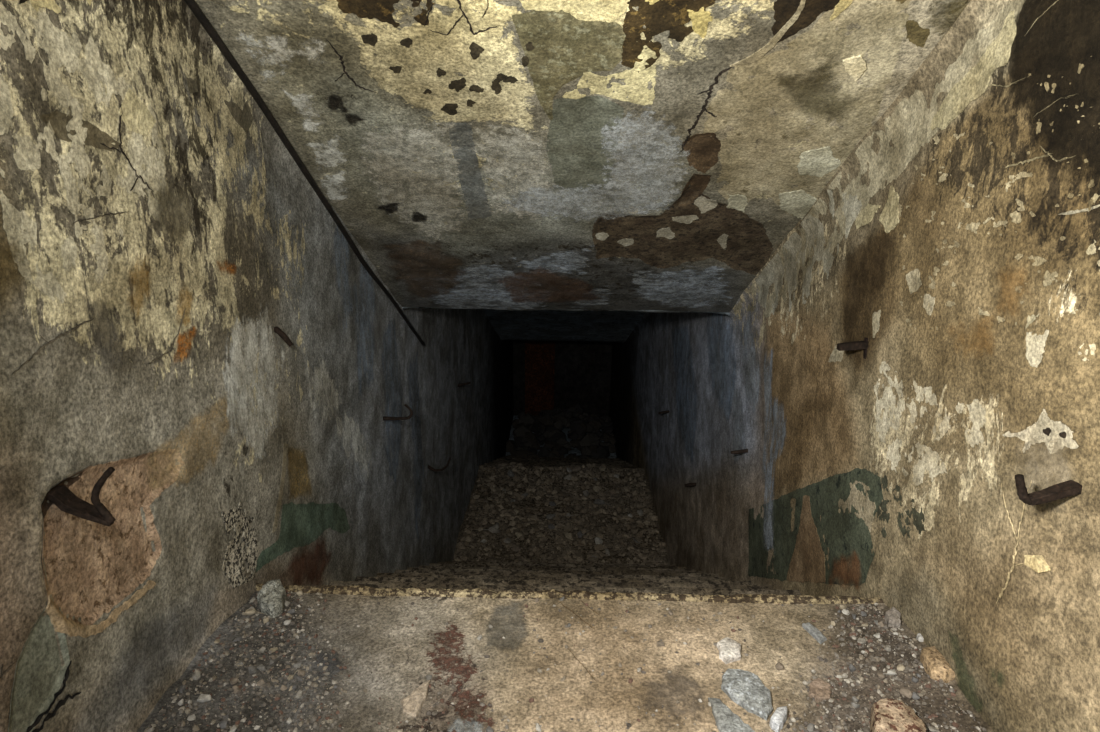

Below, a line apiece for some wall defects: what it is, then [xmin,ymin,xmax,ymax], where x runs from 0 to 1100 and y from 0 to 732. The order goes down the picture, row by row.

peeling [0,0,61,70]
peeling [336,0,435,48]
peeling [469,42,484,60]
flaking render [39,87,123,151]
flaking render [224,99,253,134]
peeling [436,68,518,115]
crack [679,67,732,154]
spalling [592,0,1026,318]
peeling [0,168,78,303]
peeling [1078,343,1096,361]
flaking render [8,449,185,732]
crack [26,661,81,732]